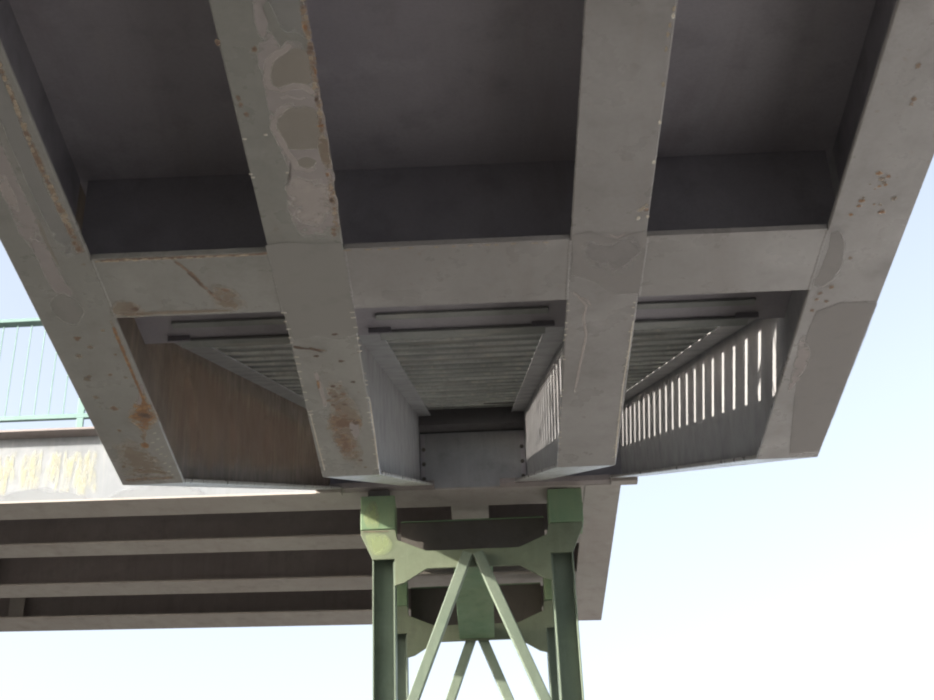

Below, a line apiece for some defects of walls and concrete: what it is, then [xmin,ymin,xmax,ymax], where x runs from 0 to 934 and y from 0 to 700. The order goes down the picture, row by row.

peeling [252,0,339,235]
corrosion [300,0,340,237]
corrosion [95,252,267,316]
water stain [0,452,96,504]
corrosion [101,327,173,482]
corrosion [314,372,367,468]